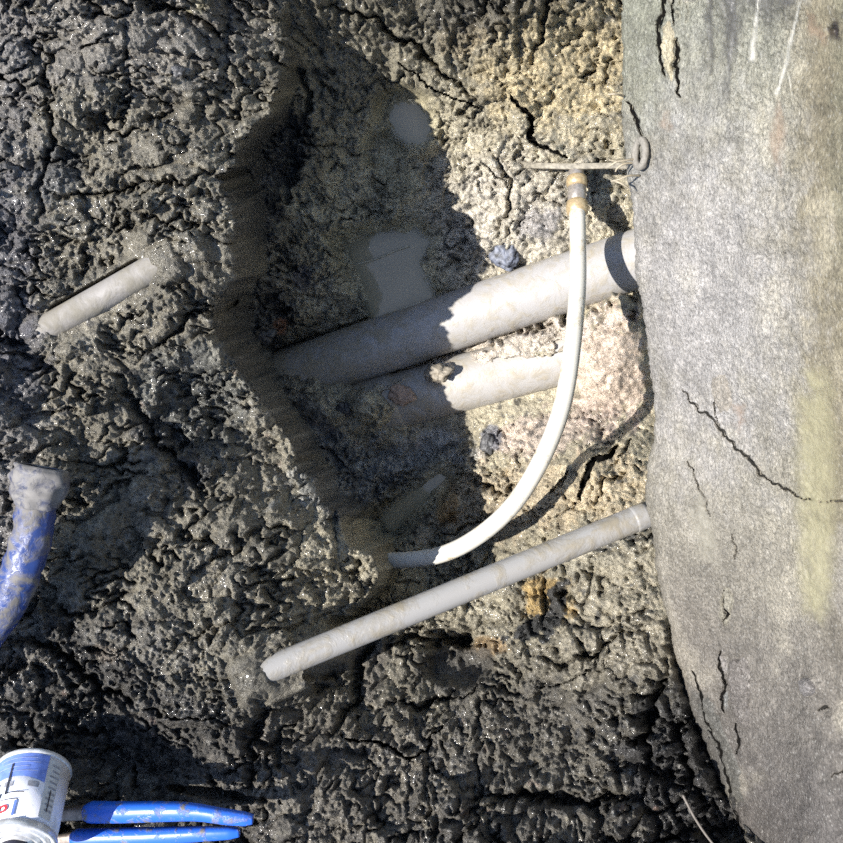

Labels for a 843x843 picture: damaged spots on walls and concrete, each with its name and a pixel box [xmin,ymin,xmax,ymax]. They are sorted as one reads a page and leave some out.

spalling [657,0,696,97]
crack [682,390,843,504]